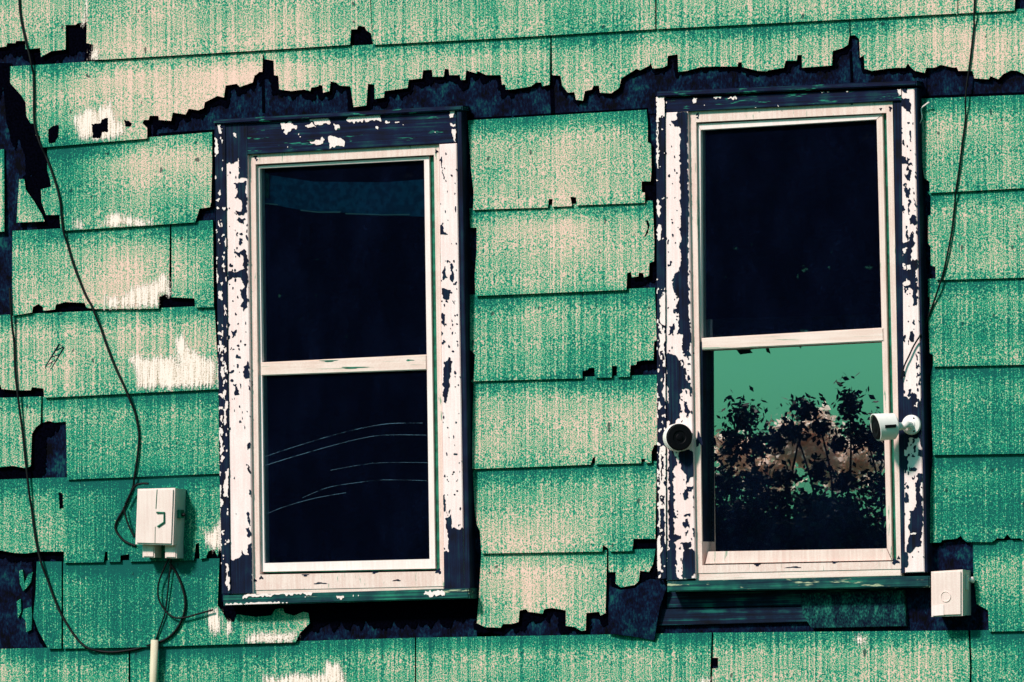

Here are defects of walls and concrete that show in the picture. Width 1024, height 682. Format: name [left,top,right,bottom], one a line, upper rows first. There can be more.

peeling [215,124,258,515]
peeling [221,512,327,605]
peeling [281,115,399,148]
peeling [424,260,464,597]
peeling [435,150,457,245]
peeling [656,96,737,580]
peeling [879,89,930,306]
peeling [892,320,924,568]